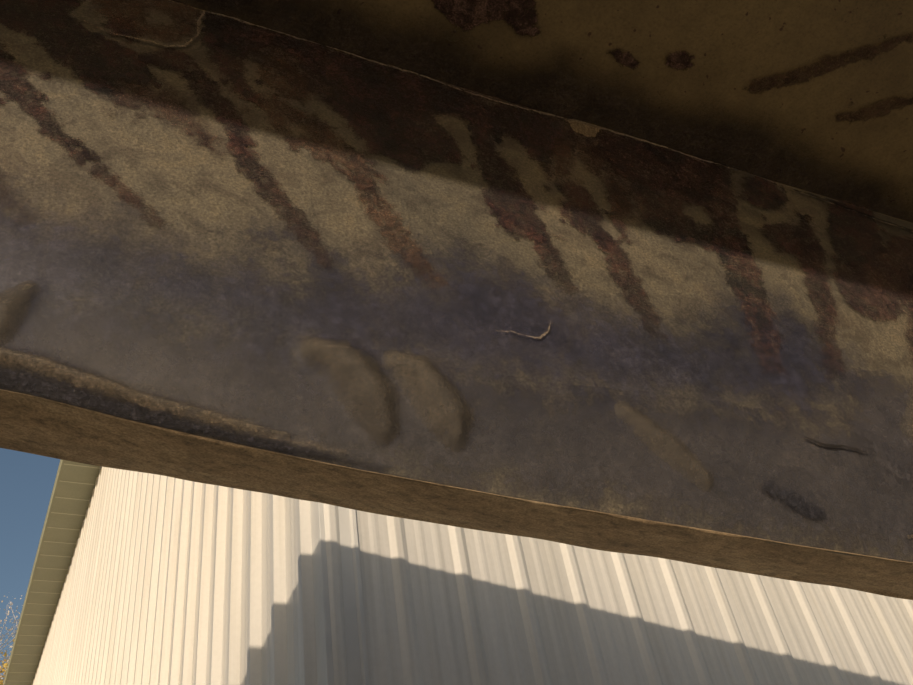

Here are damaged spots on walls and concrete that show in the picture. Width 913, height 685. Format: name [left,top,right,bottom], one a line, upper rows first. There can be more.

corrosion [0,43,164,223]
corrosion [96,47,328,256]
corrosion [431,0,541,38]
crack [74,11,913,232]
corrosion [471,136,577,291]
corrosion [543,180,659,330]
corrosion [665,51,695,71]
corrosion [760,209,844,371]
corrosion [744,35,913,94]
leakage [0,194,913,562]